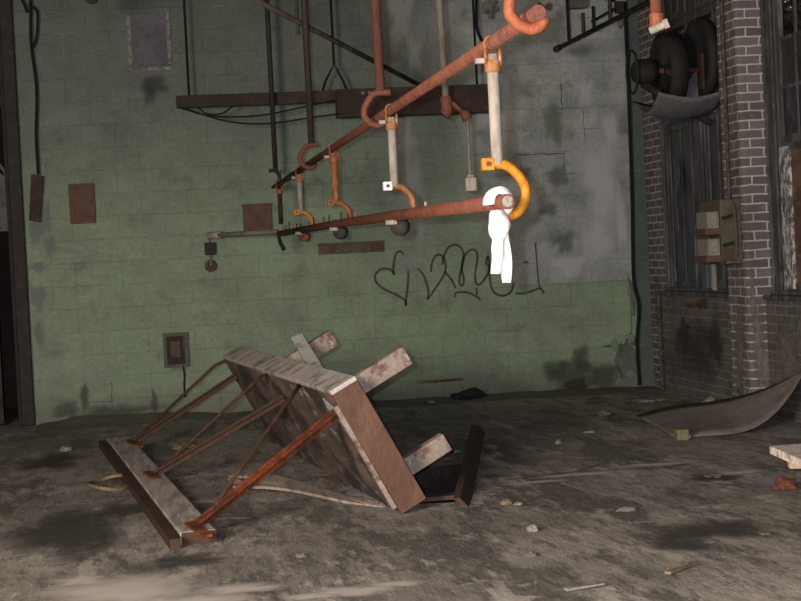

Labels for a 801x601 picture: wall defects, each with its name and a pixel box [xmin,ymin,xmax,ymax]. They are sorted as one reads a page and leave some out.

peeling [610,334,636,385]